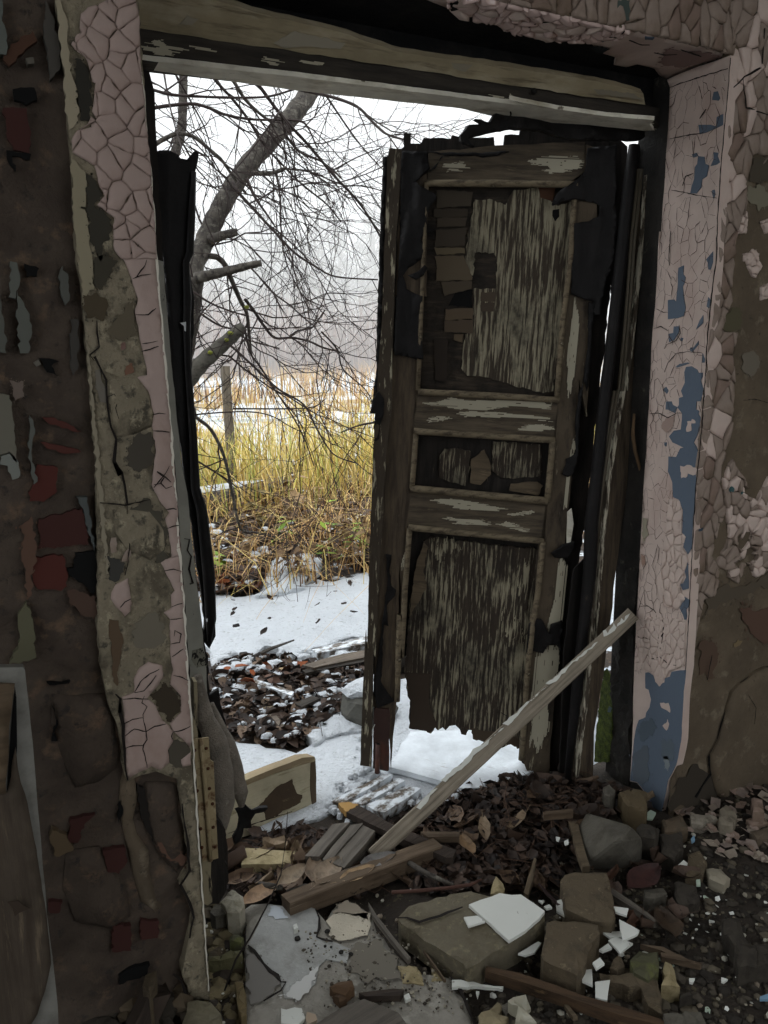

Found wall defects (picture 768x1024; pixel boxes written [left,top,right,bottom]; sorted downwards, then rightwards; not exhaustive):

peeling [447,0,630,44]
flaking render [32,508,97,594]
peeling [67,0,192,843]
crack [89,321,194,823]
crack [609,28,768,680]
peeling [630,0,768,821]